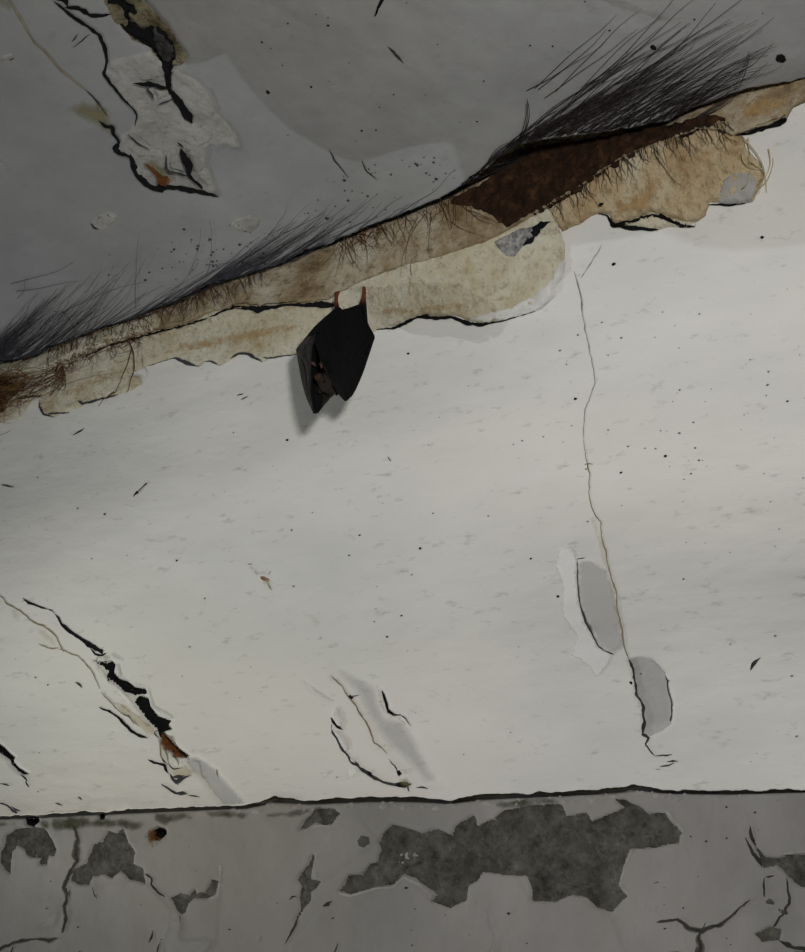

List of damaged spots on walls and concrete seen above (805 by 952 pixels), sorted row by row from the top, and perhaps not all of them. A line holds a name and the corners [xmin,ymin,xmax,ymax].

crack [8,0,219,197]
flaking render [104,0,241,195]
rust [144,163,170,187]
crack [574,213,695,756]
crack [0,596,218,797]
rust [102,693,184,766]
crack [331,677,428,792]
flaking render [0,827,56,873]
flaking render [71,829,145,885]
flaking render [323,799,684,911]
crack [657,899,751,952]
flaking render [745,826,805,915]